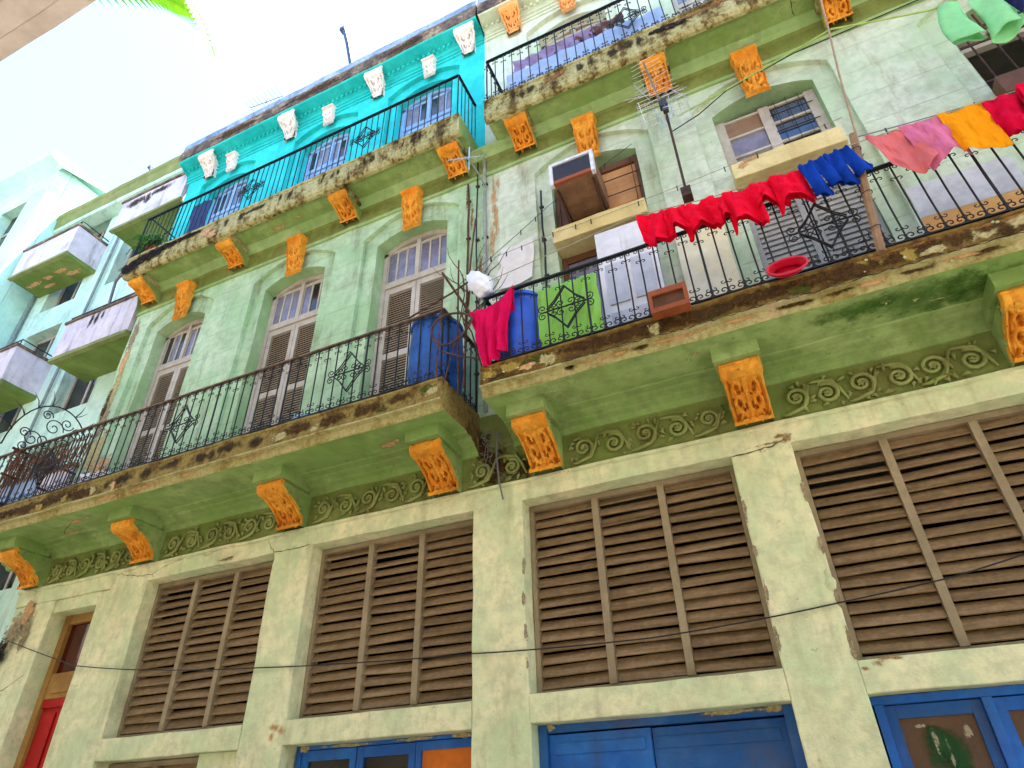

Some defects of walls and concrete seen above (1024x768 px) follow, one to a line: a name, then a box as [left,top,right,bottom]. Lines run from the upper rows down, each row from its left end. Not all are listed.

damp [607,36,643,56]
damp [126,184,171,207]
peeling [26,267,81,289]
damp [558,221,1015,353]
damp [283,392,410,434]
damp [196,436,263,462]
crack [732,440,782,457]
damp [0,458,181,519]
spalling [0,600,35,662]